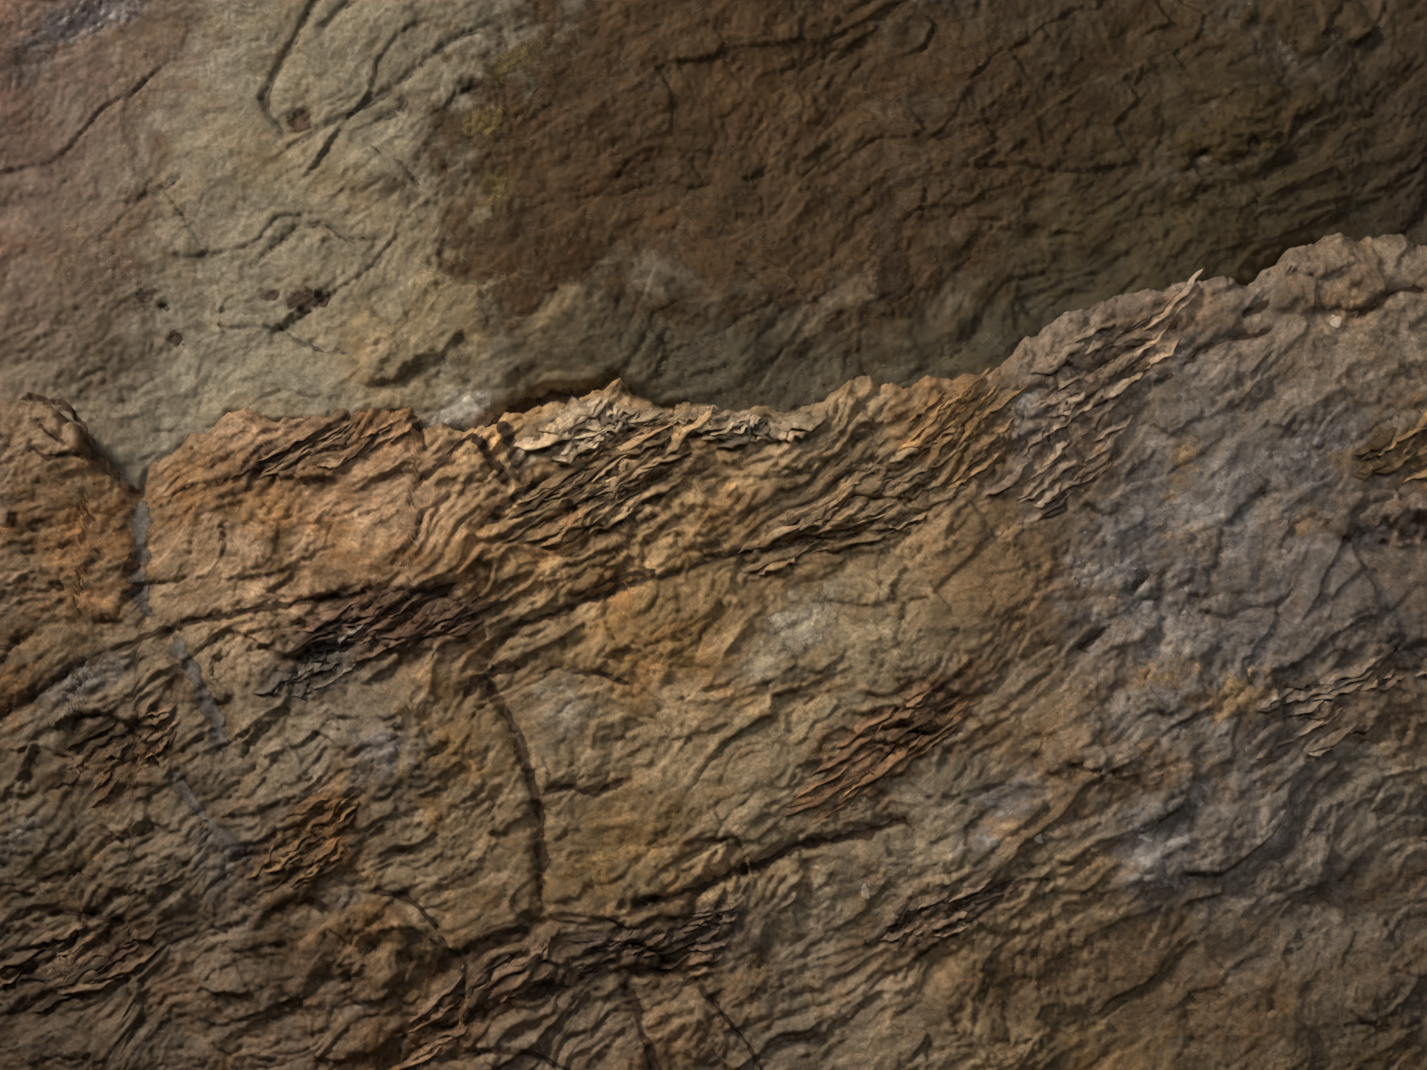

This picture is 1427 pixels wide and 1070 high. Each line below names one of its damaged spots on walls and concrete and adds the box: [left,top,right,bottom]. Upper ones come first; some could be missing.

peeling [165,330,184,346]
peeling [260,286,330,315]
spalling [217,408,421,490]
crack [367,377,666,528]
spalling [500,385,827,560]
spalling [738,269,1207,580]
spalling [1350,392,1427,491]
crack [0,392,461,753]
crack [365,537,836,976]
crack [41,873,126,925]
crack [170,771,328,931]
crack [387,964,763,1070]